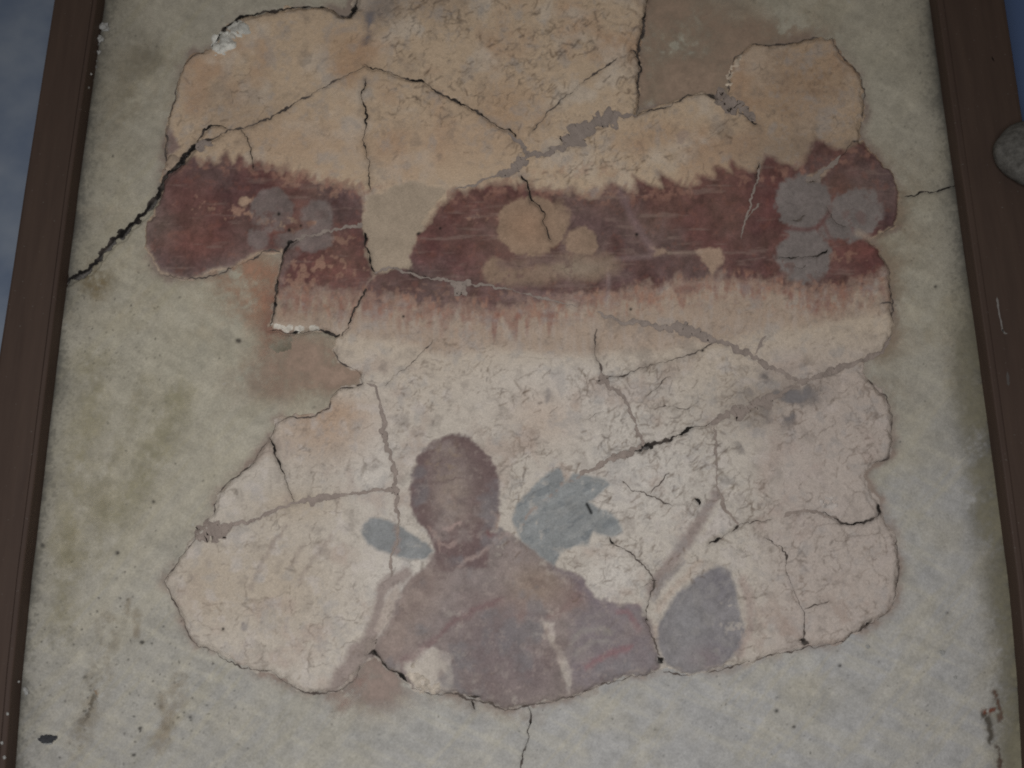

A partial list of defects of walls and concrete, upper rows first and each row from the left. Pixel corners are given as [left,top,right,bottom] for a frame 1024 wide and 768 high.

spalling [211,20,251,56]
crack [67,2,866,285]
crack [904,185,955,197]
crack [164,223,900,768]